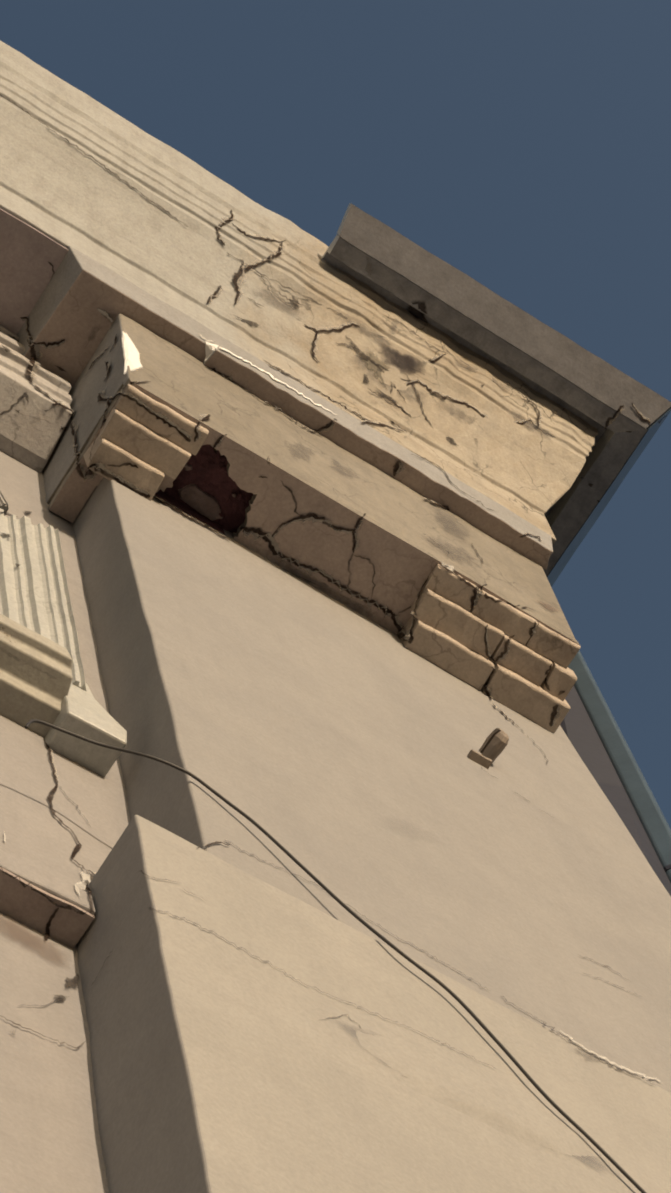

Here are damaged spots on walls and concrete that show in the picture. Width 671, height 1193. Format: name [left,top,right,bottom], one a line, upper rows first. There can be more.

crack [0,94,178,221]
crack [205,209,553,511]
flaking render [159,444,254,533]
crack [0,317,548,763]
crack [544,663,553,691]
crack [45,742,96,916]
crack [45,908,59,941]